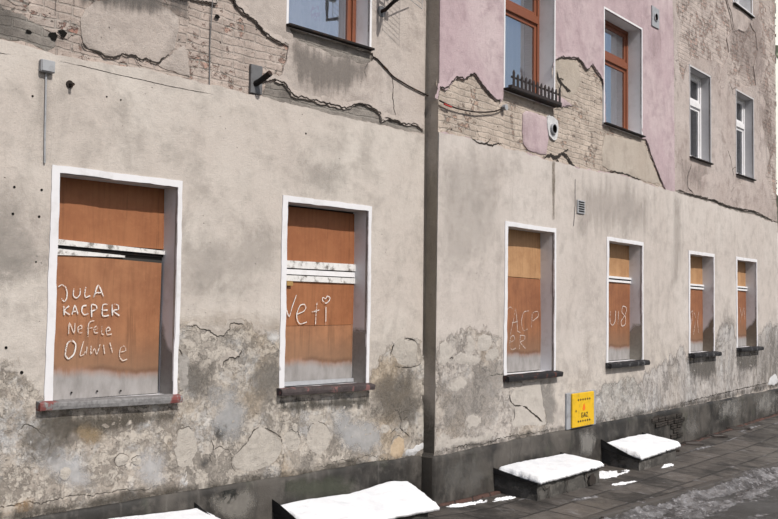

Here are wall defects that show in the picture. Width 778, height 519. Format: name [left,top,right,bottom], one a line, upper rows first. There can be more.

spalling [0,0,424,134]
damp [295,44,363,87]
crack [266,63,424,129]
spalling [436,57,664,189]
spalling [676,0,776,207]
crack [646,140,774,221]
peeling [0,322,424,519]
crack [184,318,249,366]
damp [405,413,494,500]
peeling [435,326,548,456]
damp [690,318,715,379]
damp [737,319,757,369]